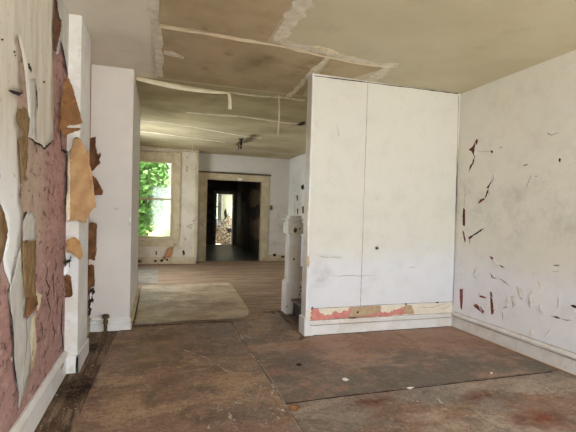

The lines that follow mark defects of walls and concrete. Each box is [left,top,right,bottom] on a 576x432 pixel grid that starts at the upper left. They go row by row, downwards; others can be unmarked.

peeling [310,305,414,321]